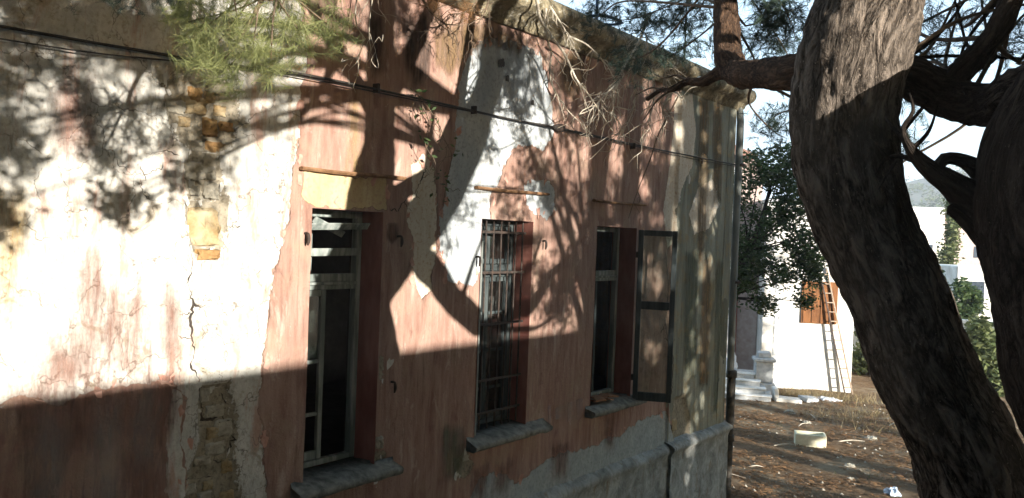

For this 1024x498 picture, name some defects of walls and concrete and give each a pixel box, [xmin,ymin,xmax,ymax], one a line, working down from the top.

peeling [0,0,391,498]
crack [180,245,236,480]
peeling [402,31,558,309]
peeling [452,393,691,498]